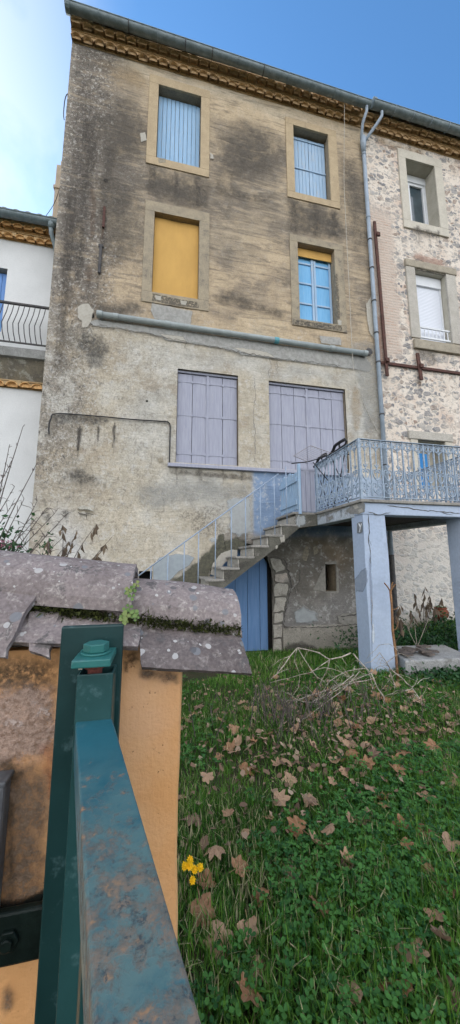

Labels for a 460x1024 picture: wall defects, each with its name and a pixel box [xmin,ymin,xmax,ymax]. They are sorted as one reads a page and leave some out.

water stain [79,333,107,365]